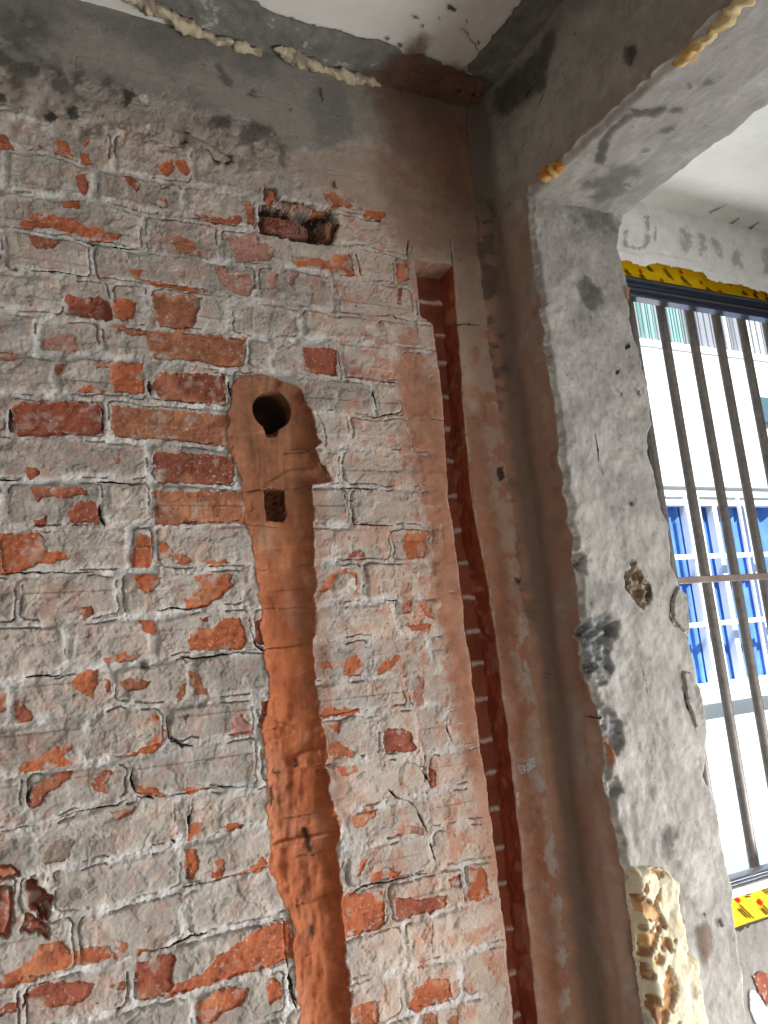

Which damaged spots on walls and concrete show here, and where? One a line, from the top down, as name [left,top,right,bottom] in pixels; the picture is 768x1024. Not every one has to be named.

water stain [0,56,82,92]
water stain [240,123,284,154]
water stain [596,108,682,164]
spalling [17,140,122,249]
spalling [194,189,385,297]
flaking render [11,269,248,527]
spalling [129,533,264,651]
spalling [624,560,652,609]
crack [388,790,435,859]
flaking render [341,852,489,938]
flaking render [0,864,294,1024]
spalling [408,977,459,1024]